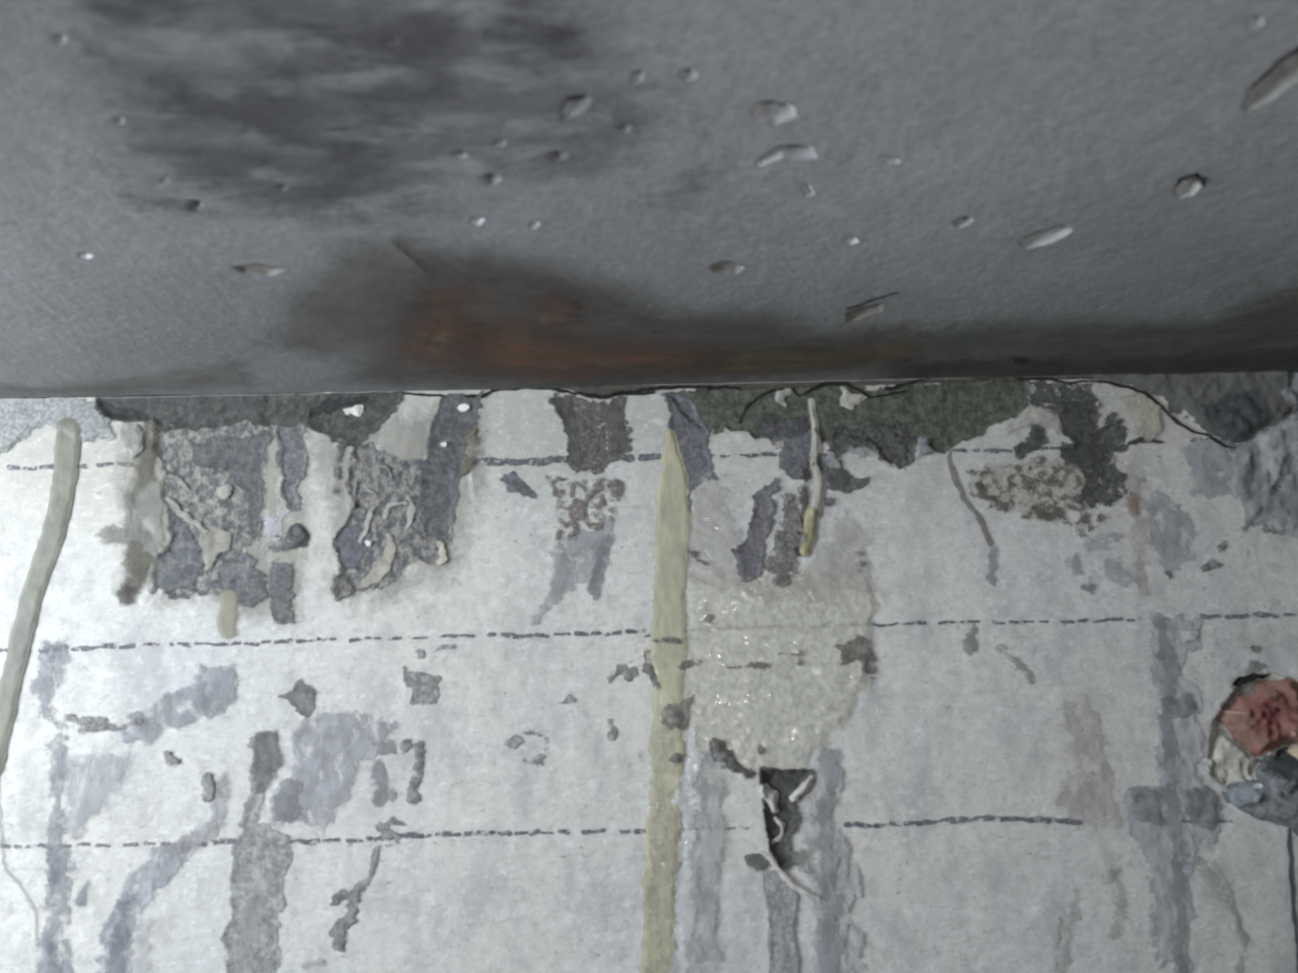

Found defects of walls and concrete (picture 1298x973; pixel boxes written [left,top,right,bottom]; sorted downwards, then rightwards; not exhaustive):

spalling [1242,46,1298,113]
spalling [95,391,483,638]
spalling [532,392,632,625]
corrosion [291,241,914,388]
crack [372,379,929,424]
crack [972,377,1236,449]
leakage [0,418,236,973]
leakage [220,679,424,973]
leakage [607,398,877,973]
spalling [1207,660,1298,788]